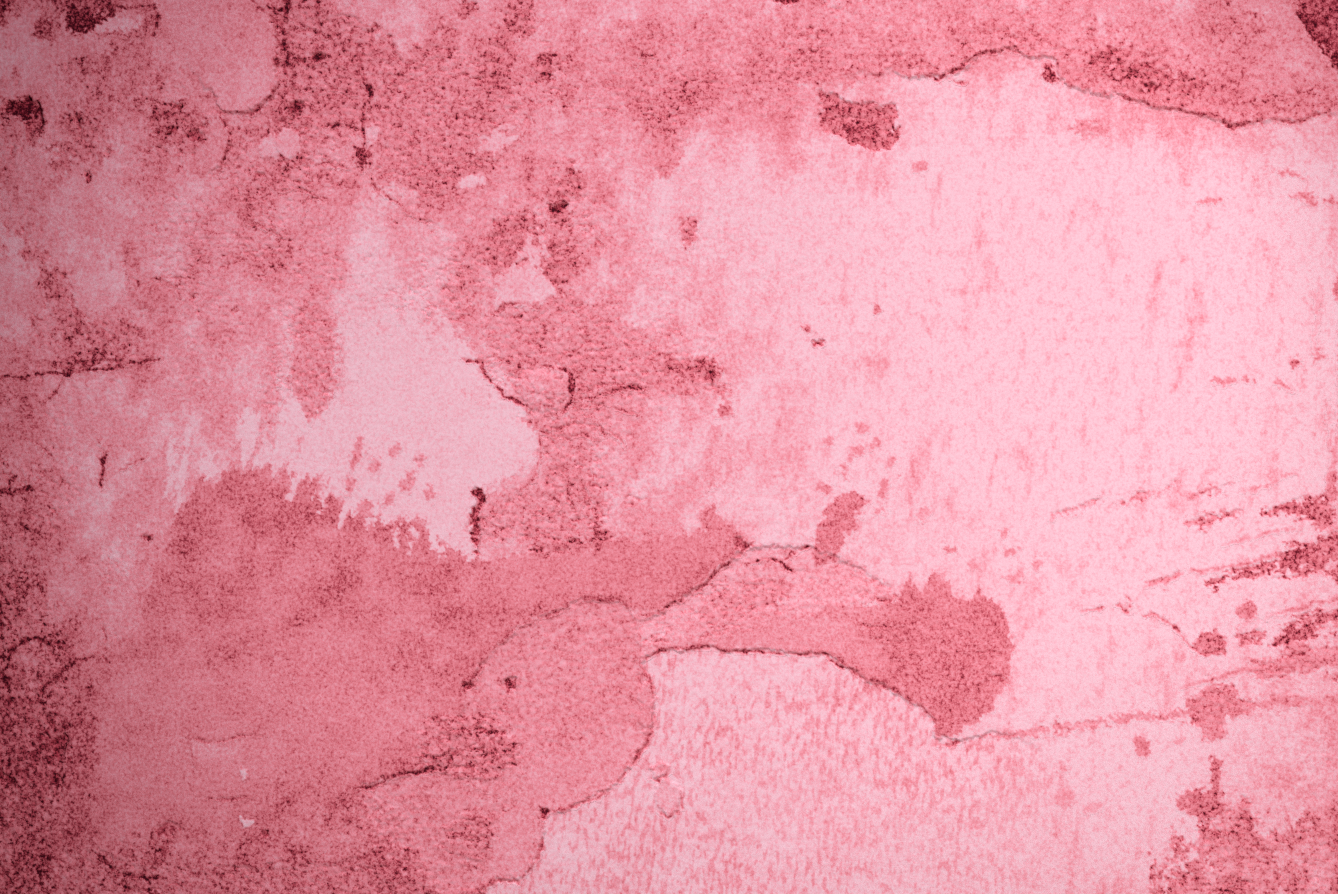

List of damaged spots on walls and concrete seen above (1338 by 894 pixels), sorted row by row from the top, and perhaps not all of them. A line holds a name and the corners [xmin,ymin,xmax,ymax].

crack [773,0,800,8]
crack [214,0,430,237]
crack [907,25,1338,134]
peeling [1204,347,1333,390]
spalling [18,157,1105,894]
peeling [1143,477,1338,594]
spalling [0,527,74,888]
crack [352,534,971,894]
crack [975,648,1010,684]
peeling [1132,734,1152,759]
peeling [978,595,1338,748]
peeling [1142,754,1338,894]